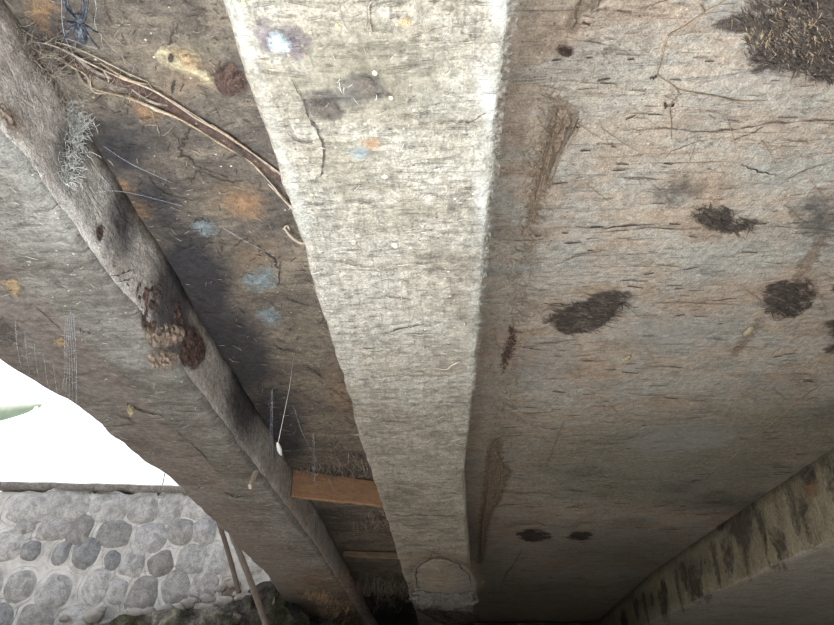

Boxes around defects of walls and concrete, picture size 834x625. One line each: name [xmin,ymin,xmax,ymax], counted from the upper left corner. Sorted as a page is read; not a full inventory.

crack [269,79,325,182]
water stain [620,505,786,625]